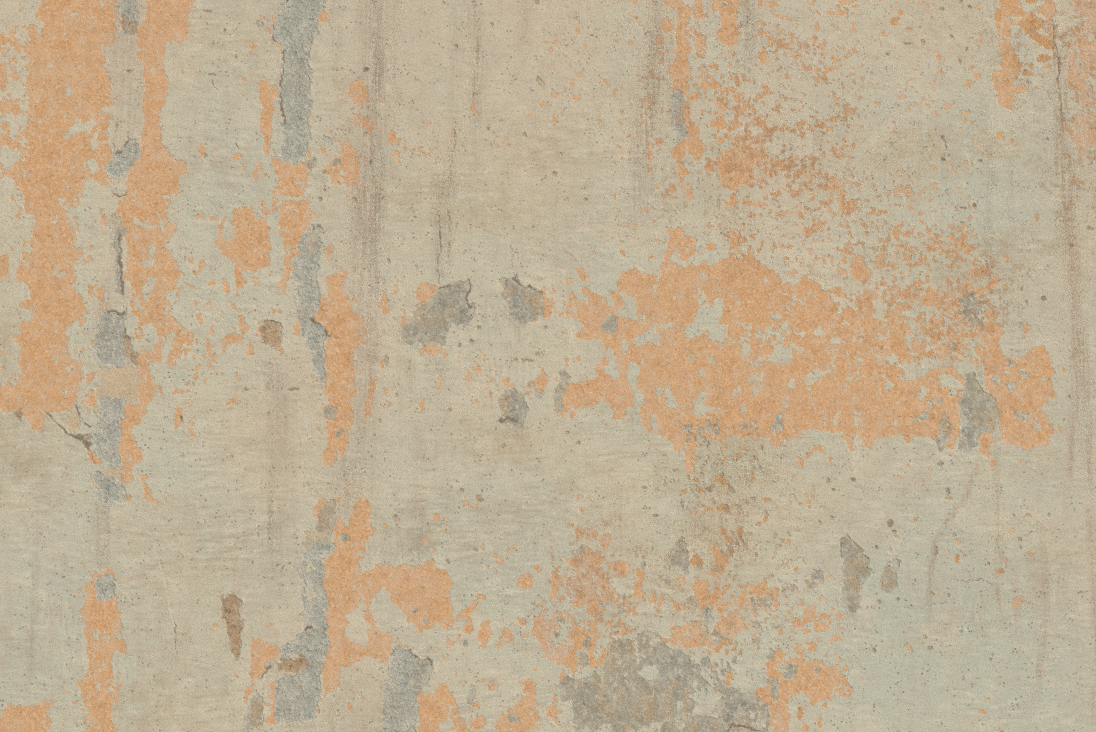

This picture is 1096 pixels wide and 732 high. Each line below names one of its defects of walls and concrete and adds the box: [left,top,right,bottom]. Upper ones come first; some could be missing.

peeling [0,0,441,510]
peeling [322,0,1096,732]
peeling [0,567,127,732]
spalling [209,592,243,661]